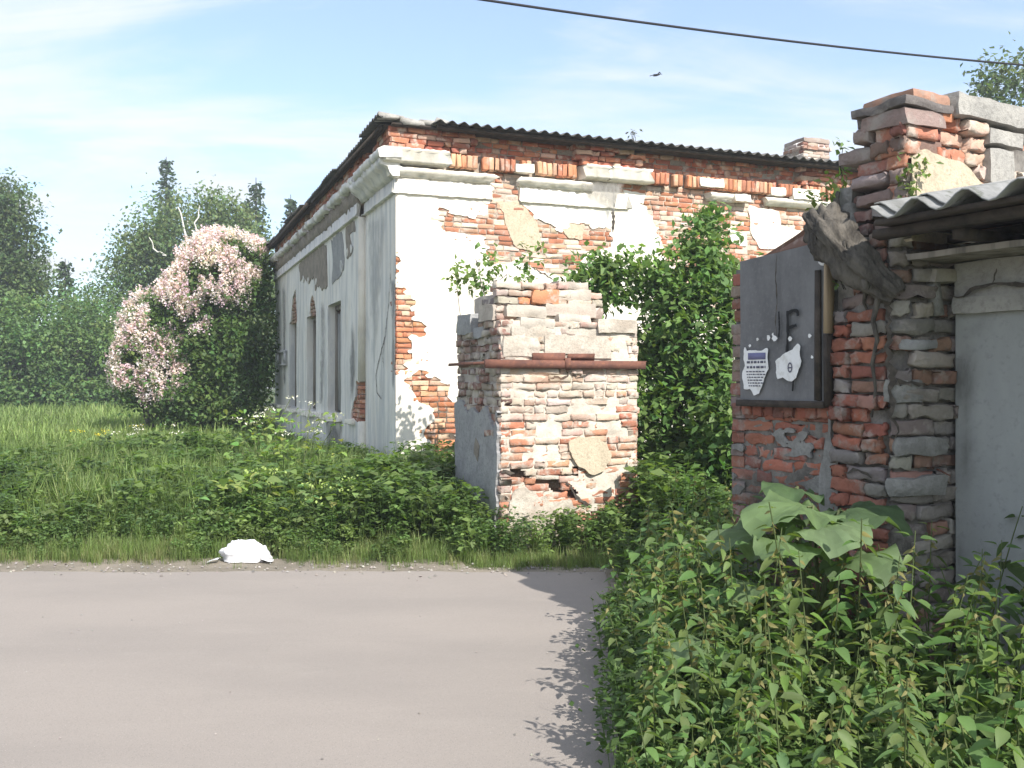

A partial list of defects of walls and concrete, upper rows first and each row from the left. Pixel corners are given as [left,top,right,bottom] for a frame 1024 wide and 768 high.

peeling [291,221,356,324]
flaking render [431,172,613,277]
flaking render [352,381,365,422]
flaking render [390,251,456,457]
spalling [617,184,840,614]